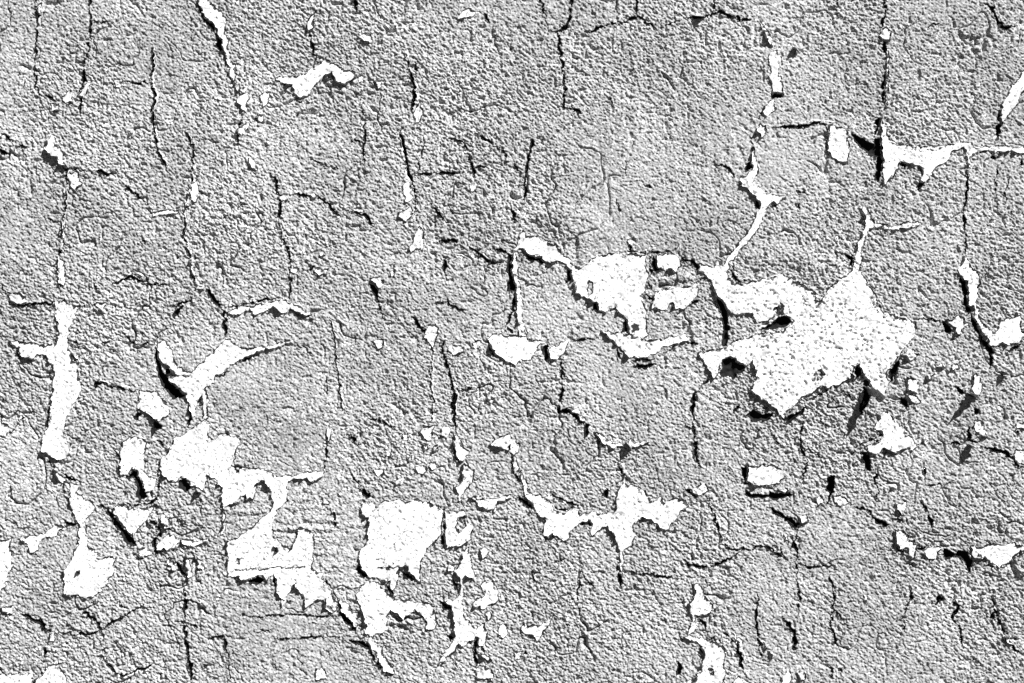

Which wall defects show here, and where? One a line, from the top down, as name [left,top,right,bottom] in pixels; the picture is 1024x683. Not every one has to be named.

peeling [197,0,384,145]
crack [539,0,751,113]
crack [94,48,227,338]
crack [270,173,373,300]
crack [395,52,534,276]
peeling [422,21,1024,471]
crack [21,601,155,679]
peeling [0,256,711,683]
peeling [680,582,745,683]
crack [631,503,804,658]
peeling [741,464,792,500]
peeling [798,493,1024,573]